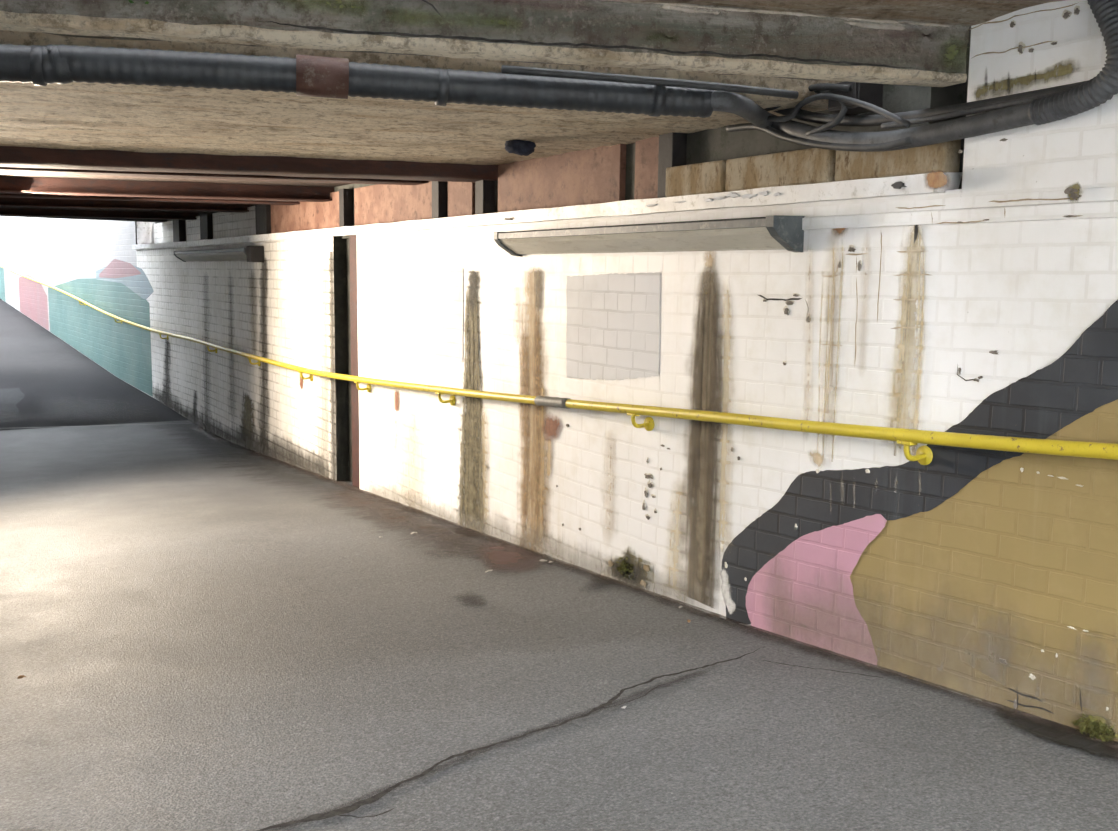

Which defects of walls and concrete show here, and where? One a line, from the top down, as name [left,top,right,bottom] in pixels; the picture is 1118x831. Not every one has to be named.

leakage [178,251,337,484]
leakage [459,272,487,533]
corrosion [520,270,569,552]
peeling [642,458,662,520]
leakage [671,253,730,607]
crack [256,648,884,831]
leakage [1001,711,1118,759]